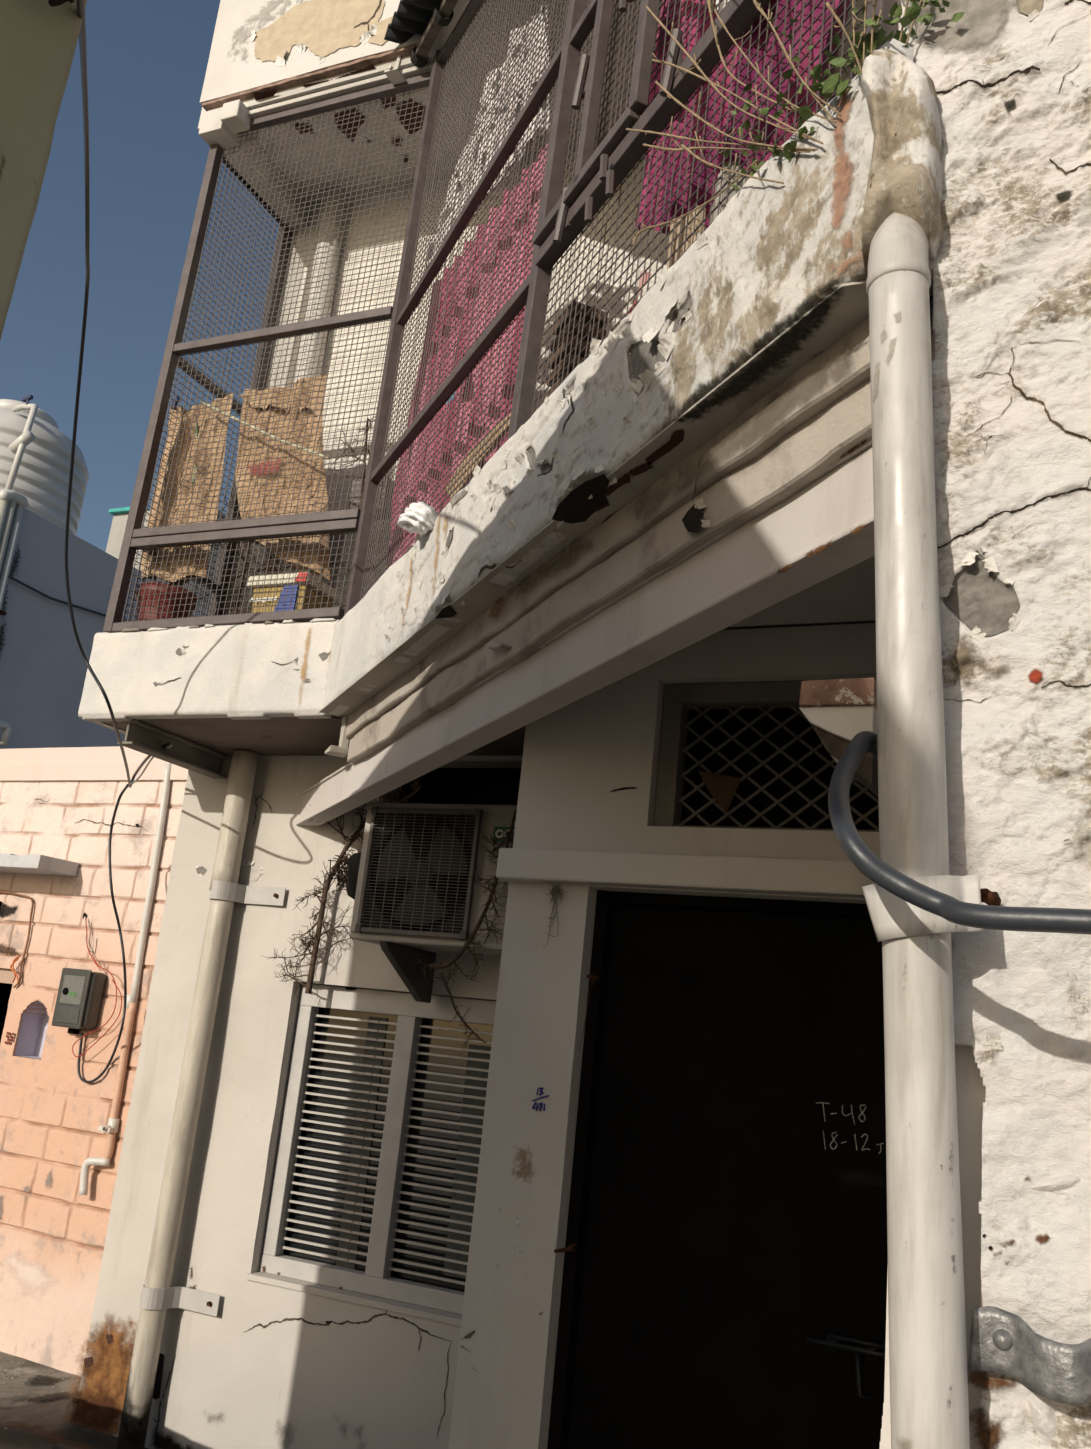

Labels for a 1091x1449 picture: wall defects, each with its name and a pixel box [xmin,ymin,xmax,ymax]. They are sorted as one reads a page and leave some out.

peeling [231,0,393,66]
crack [936,0,1091,94]
peeling [253,89,277,101]
crack [1049,158,1091,175]
spalling [544,291,692,430]
damp [676,279,841,422]
crack [971,339,1091,454]
crack [937,477,1091,548]
spalling [939,546,1021,641]
damp [116,1369,190,1449]
corrosion [969,1408,1001,1449]
corrosion [967,1370,1015,1390]